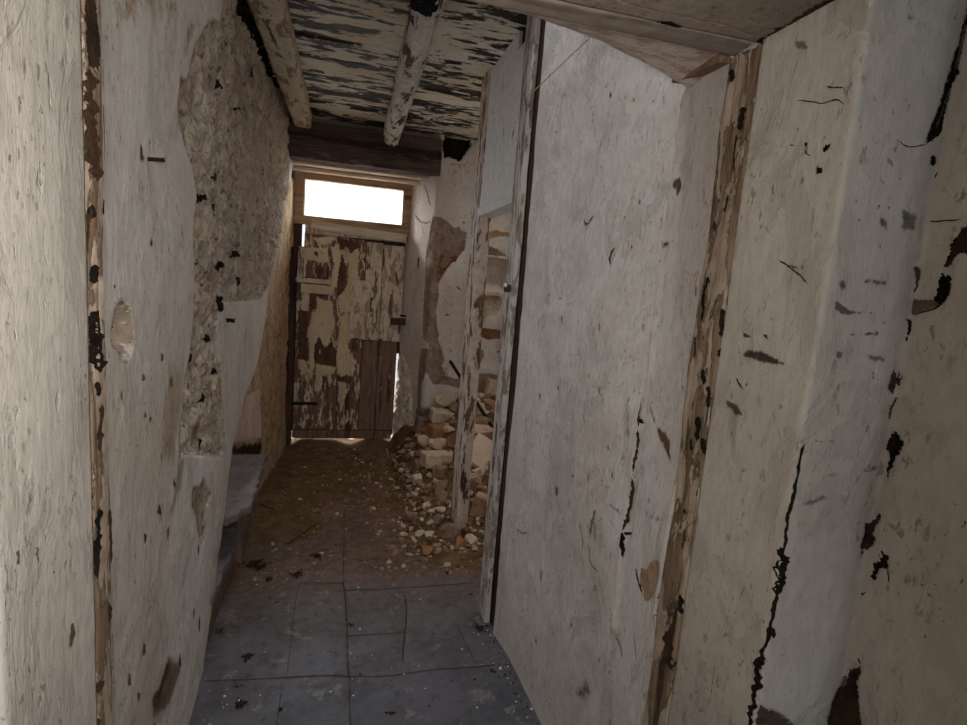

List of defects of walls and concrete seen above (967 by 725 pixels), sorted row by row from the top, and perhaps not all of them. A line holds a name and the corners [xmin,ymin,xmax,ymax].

peeling [500,7,718,86]
spalling [169,0,361,459]
spalling [111,300,135,364]
spalling [390,216,467,440]
spalling [478,295,502,393]
damp [744,351,783,365]
crack [747,444,805,725]
spalling [860,513,889,582]
peeling [755,705,793,725]
spalling [827,658,861,725]